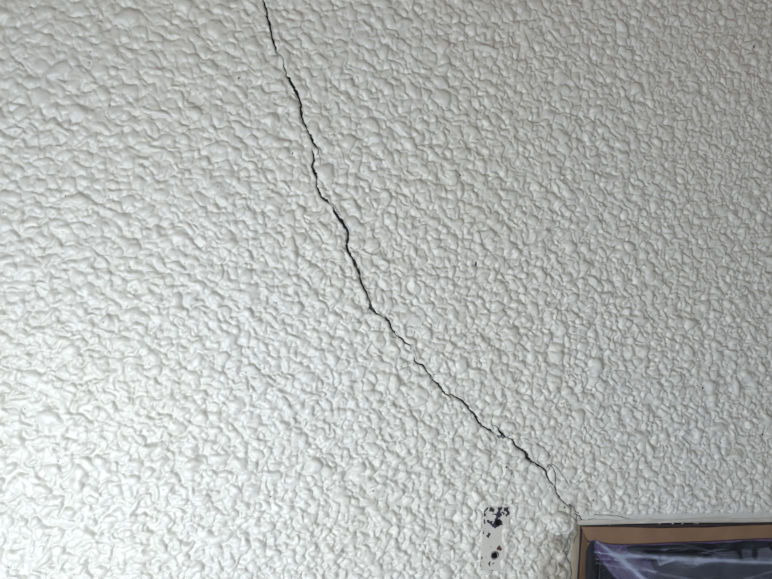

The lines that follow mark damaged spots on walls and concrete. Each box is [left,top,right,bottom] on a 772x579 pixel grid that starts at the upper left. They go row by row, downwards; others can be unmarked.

crack [261,0,629,579]